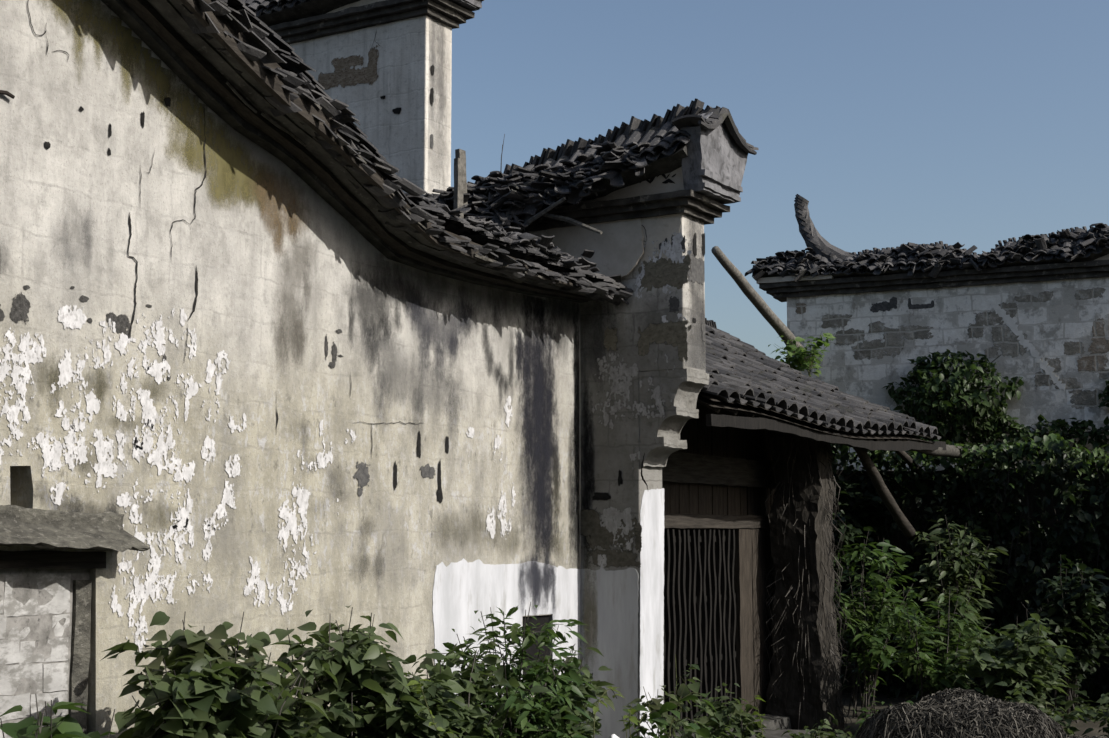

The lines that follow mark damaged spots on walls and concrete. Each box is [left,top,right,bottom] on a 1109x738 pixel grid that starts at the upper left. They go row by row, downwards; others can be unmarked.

spalling [317,45,379,90]
flaking render [0,285,247,652]
crack [128,150,155,338]
crack [170,108,207,257]
crack [184,266,198,361]
flaking render [244,419,333,615]
leakage [350,263,601,608]
spalling [580,492,642,568]
flaking render [547,218,706,429]
spalling [821,297,934,360]
spalling [967,291,1053,358]
spalling [1034,318,1109,409]